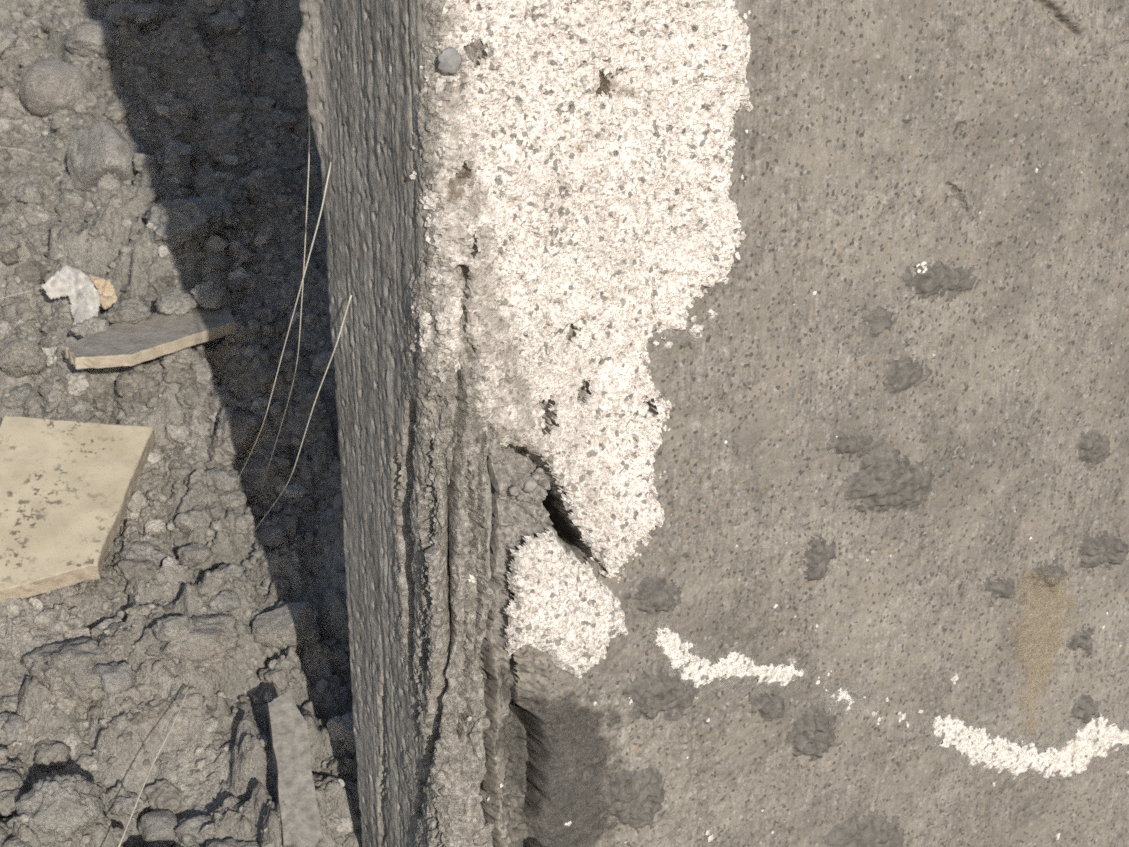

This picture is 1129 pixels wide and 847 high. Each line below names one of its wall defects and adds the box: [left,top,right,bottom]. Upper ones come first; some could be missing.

spalling [392,0,754,847]
crack [487,456,496,568]
crack [481,590,520,700]
crack [480,731,489,822]